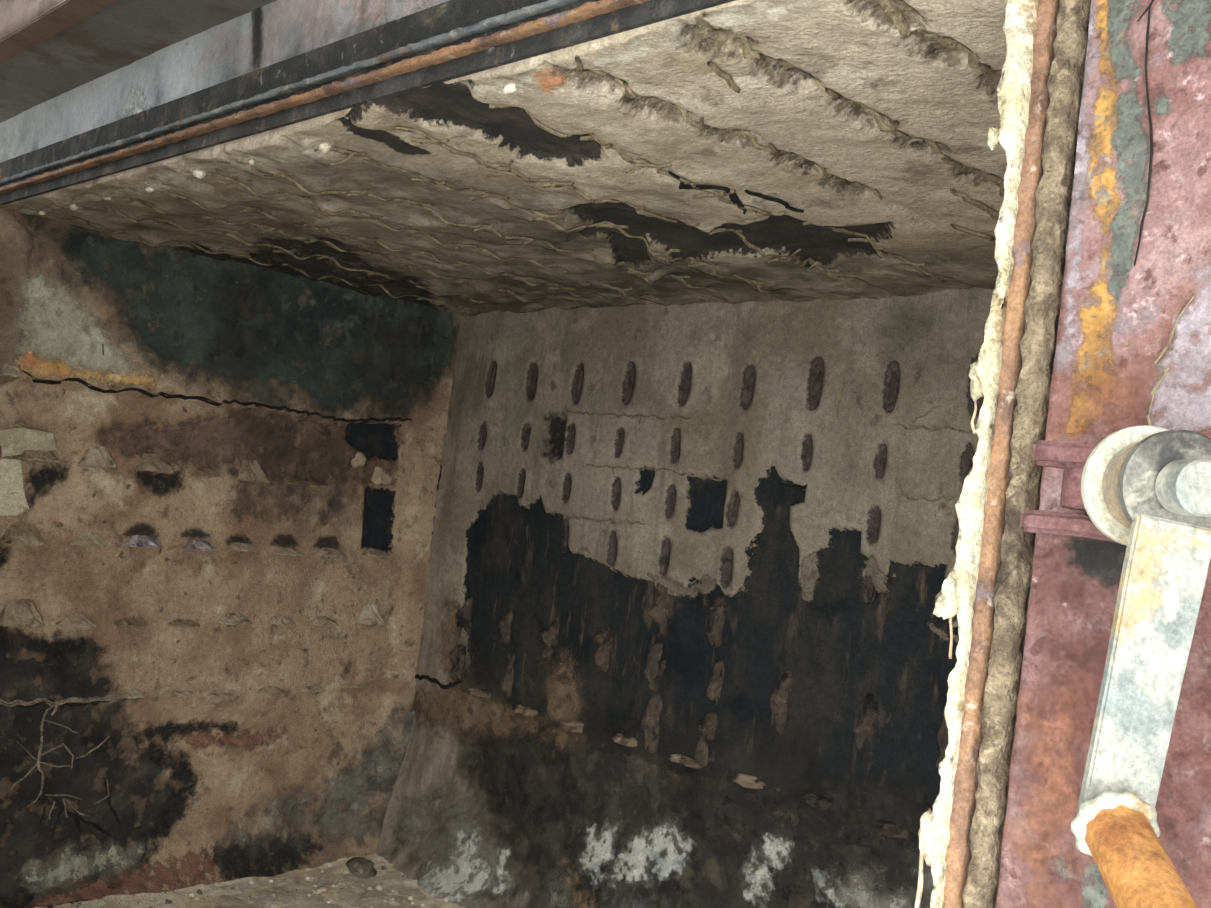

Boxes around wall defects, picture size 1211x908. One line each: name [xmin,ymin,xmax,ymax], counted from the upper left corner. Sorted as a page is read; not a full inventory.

spalling [338,79,602,167]
rust [1065,0,1142,434]
leakage [14,275,143,383]
crack [22,370,412,423]
peeling [414,0,1039,908]
crack [0,694,128,837]
leakage [26,744,198,887]
efflorescence [580,824,692,887]
efflorescence [744,834,789,903]
efflorescence [813,870,843,907]
rust [1016,577,1120,908]
rust [1155,587,1211,908]